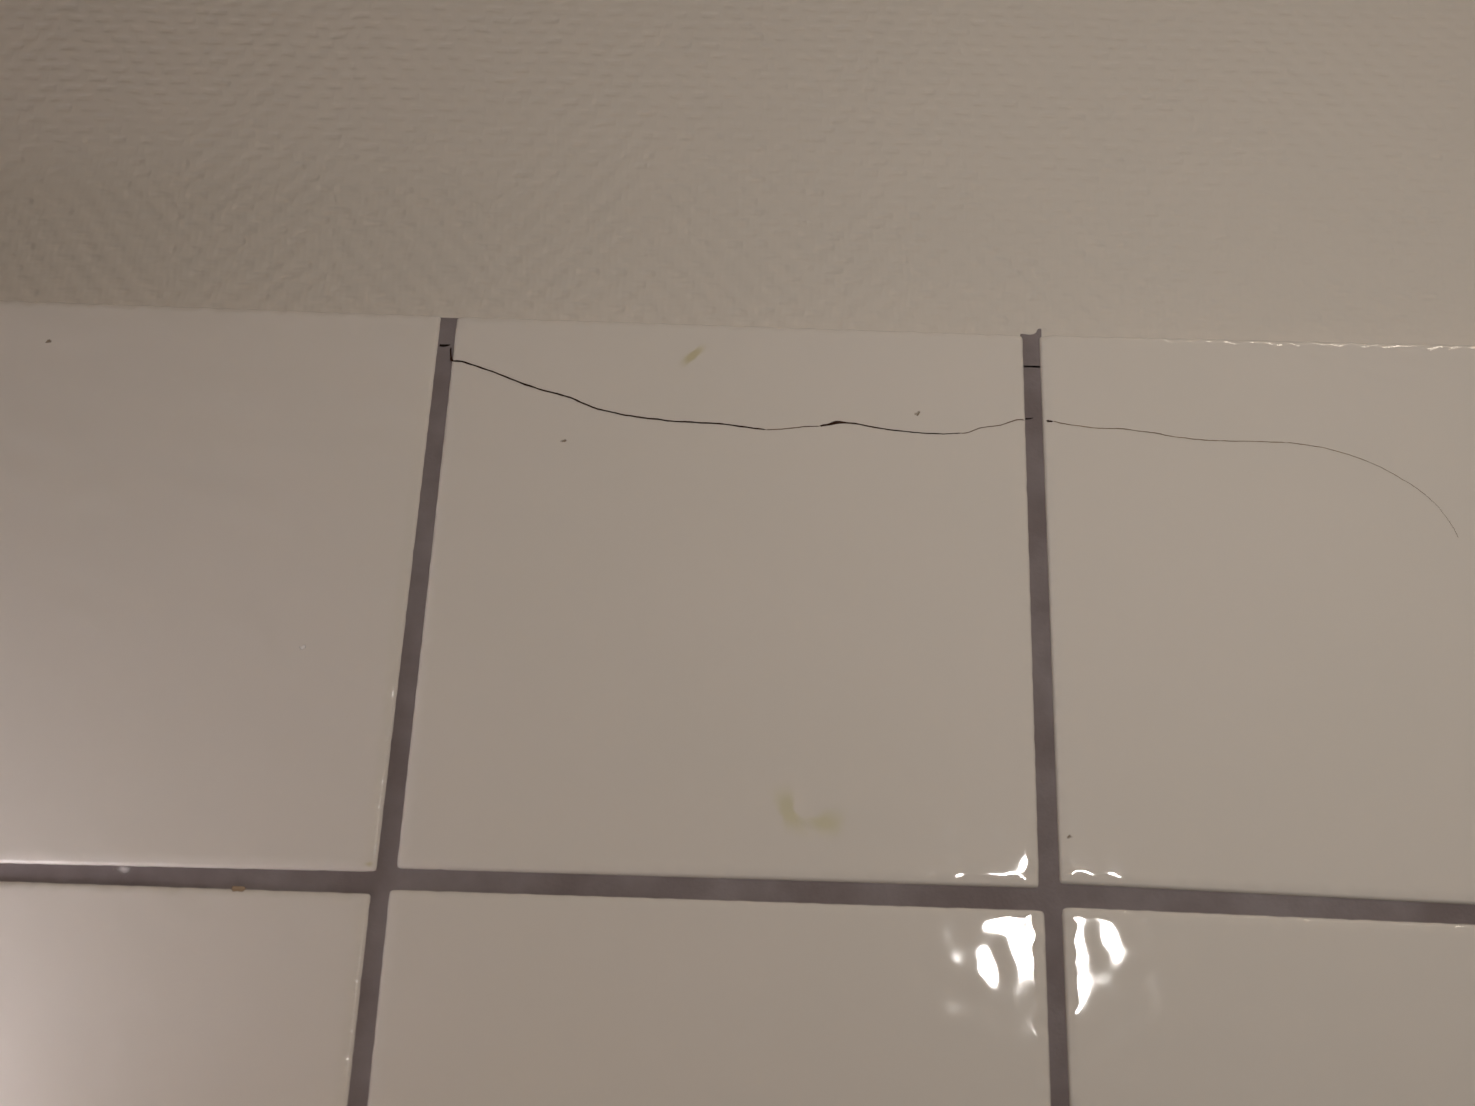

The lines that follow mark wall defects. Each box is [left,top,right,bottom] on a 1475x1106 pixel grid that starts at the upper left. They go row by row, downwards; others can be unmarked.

crack [439,344,1458,537]